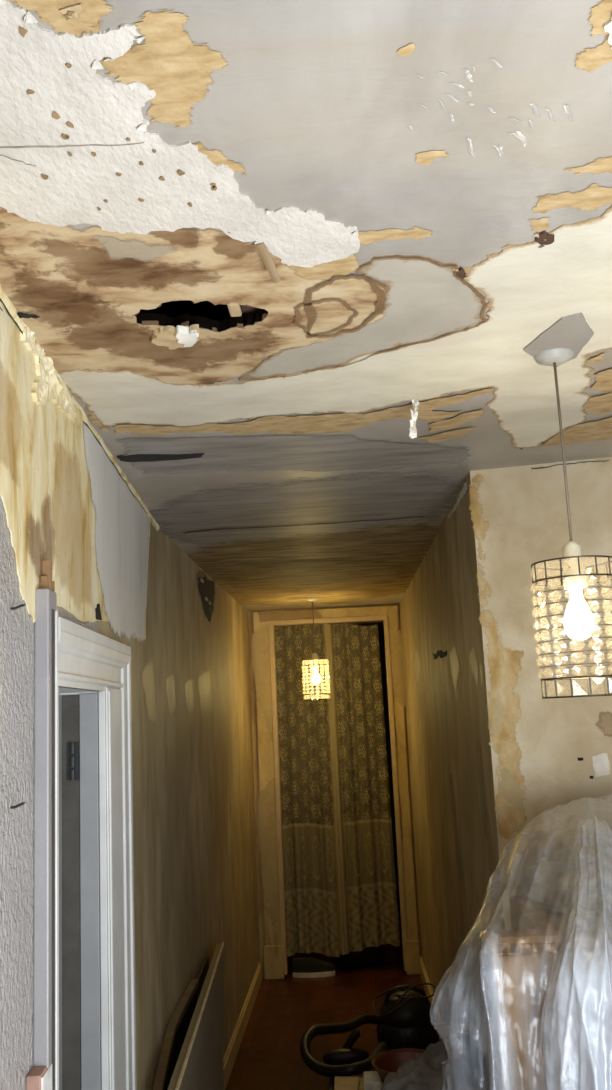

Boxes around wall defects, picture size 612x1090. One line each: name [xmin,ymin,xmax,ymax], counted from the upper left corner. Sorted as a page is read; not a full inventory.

peeling [0,0,433,280]
leakage [0,207,488,385]
peeling [0,157,612,641]
flaking render [415,150,449,165]
flaking render [575,0,612,73]
flaking render [450,475,527,839]